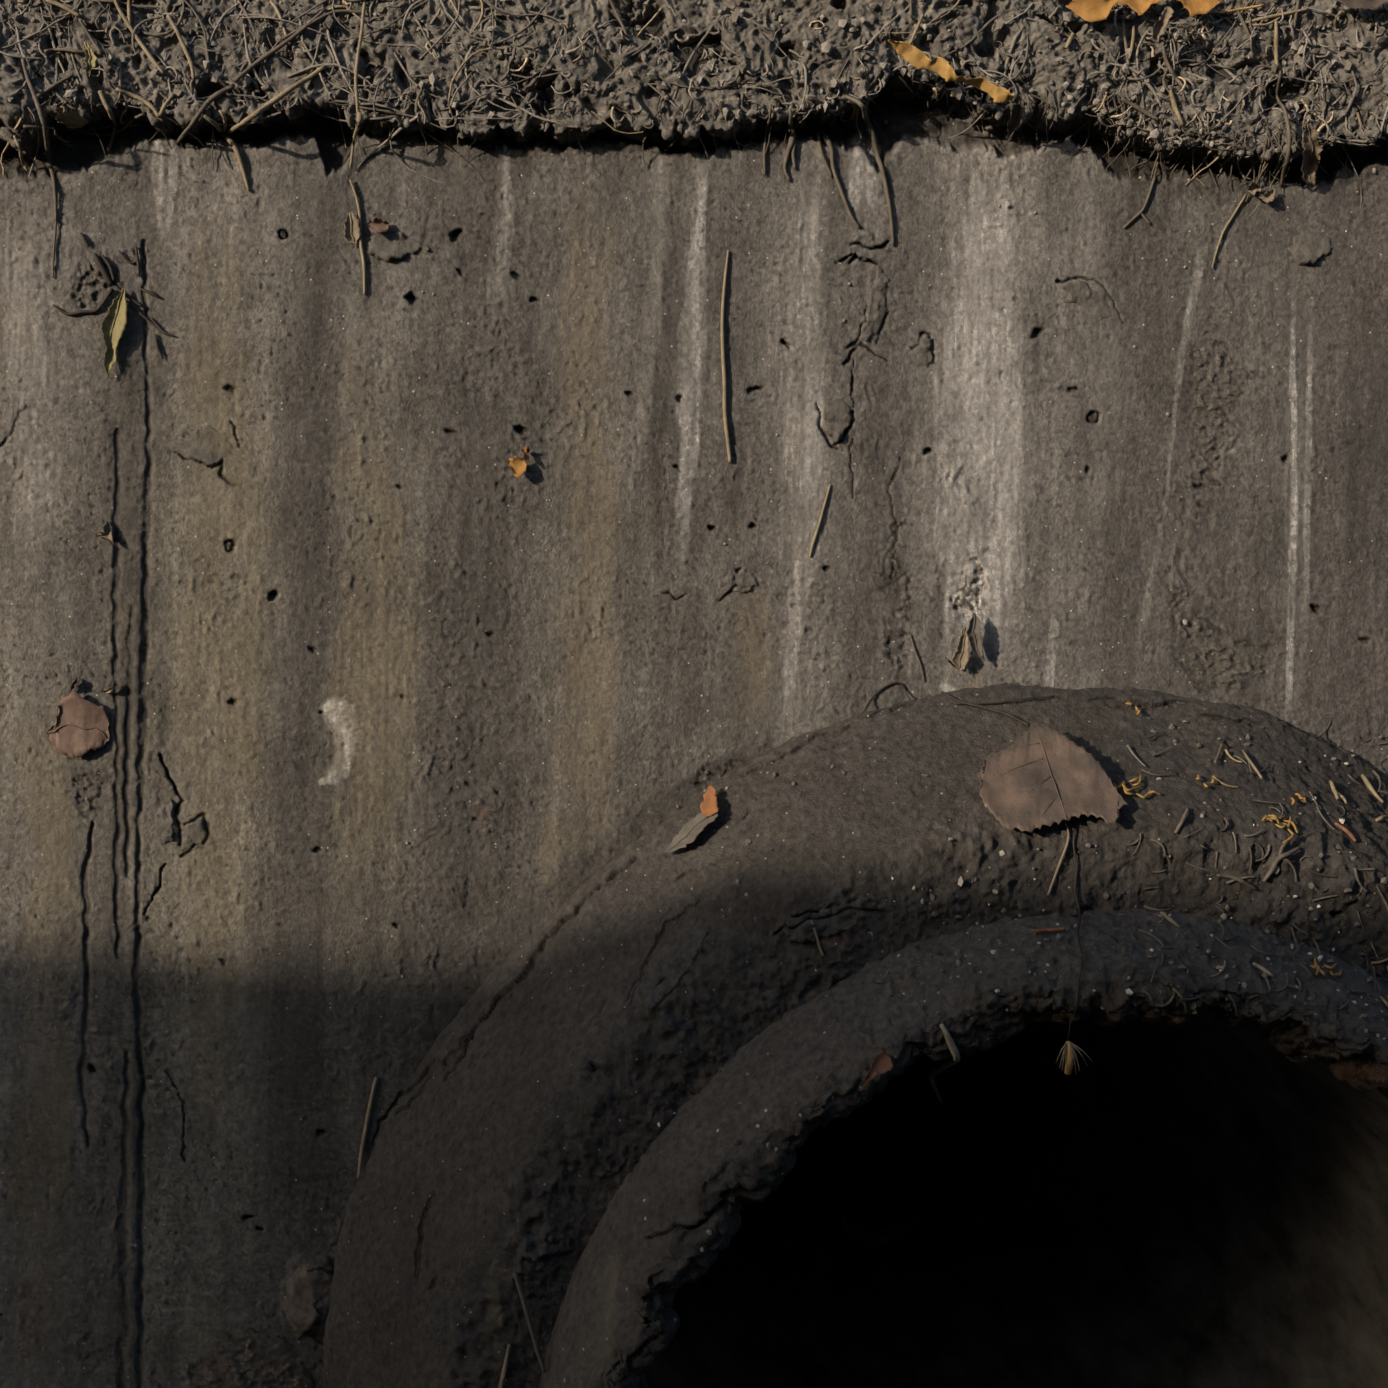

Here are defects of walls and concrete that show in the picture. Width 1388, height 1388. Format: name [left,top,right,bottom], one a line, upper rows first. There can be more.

water stain [153,141,174,223]
crack [839,241,888,264]
water stain [783,214,824,501]
water stain [788,521,820,688]
crack [818,306,935,499]
crack [887,457,900,575]
water stain [936,291,1021,625]
water stain [1291,331,1310,549]
crack [403,856,635,1099]
crack [630,870,698,1004]